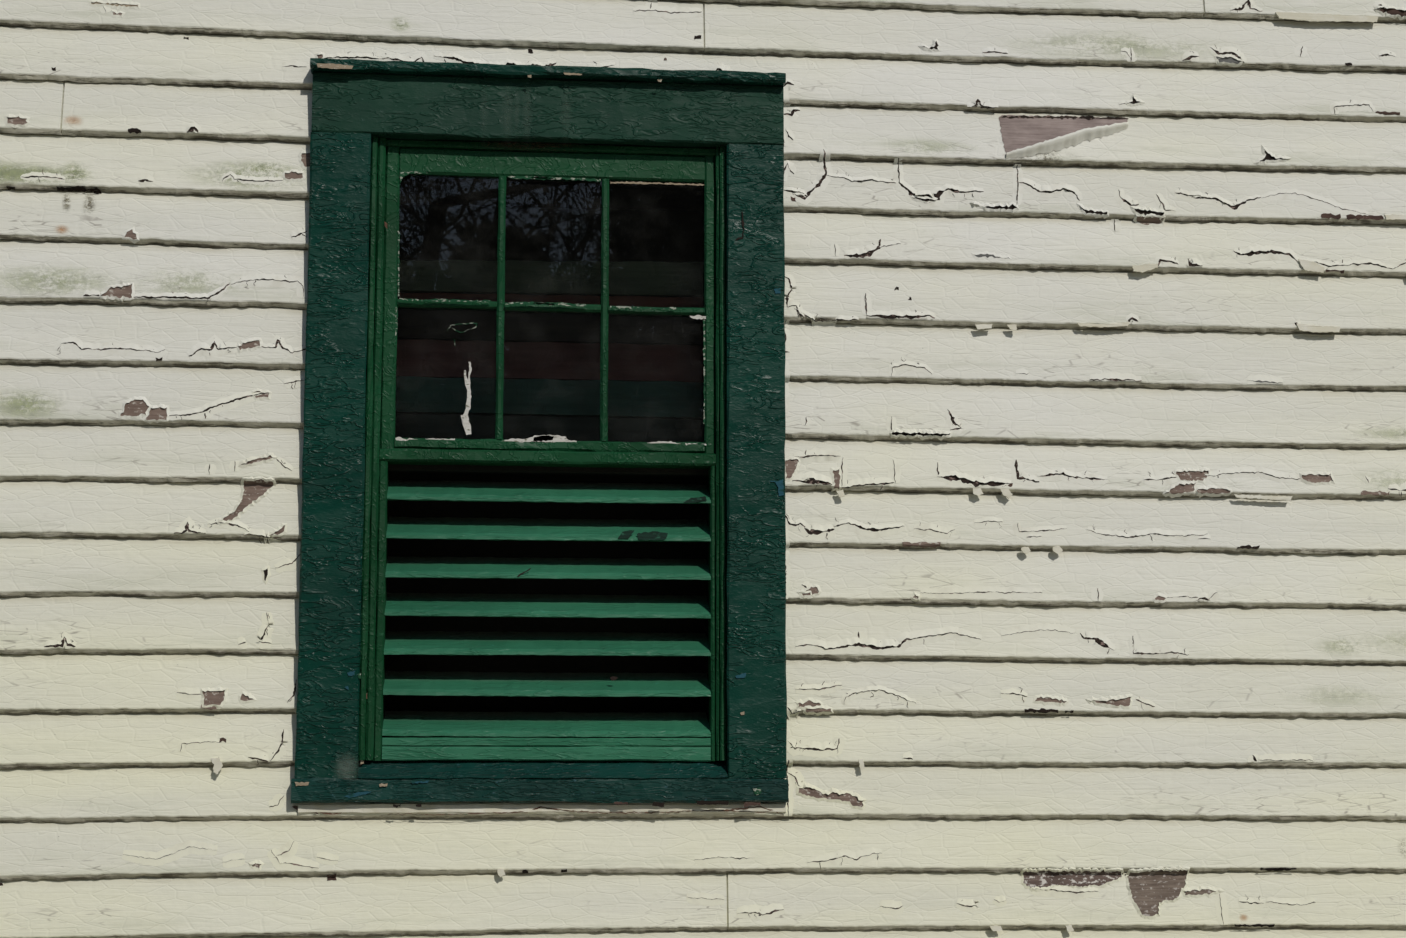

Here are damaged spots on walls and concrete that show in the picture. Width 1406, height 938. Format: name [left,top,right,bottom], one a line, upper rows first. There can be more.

peeling [118,376,305,424]
peeling [207,452,293,545]
peeling [930,462,1013,499]
peeling [1162,466,1335,500]
crack [786,457,1208,599]
crack [388,588,1189,816]
peeling [796,783,867,810]
crack [807,847,883,870]
crack [737,903,785,921]
crack [879,900,904,916]
crack [956,895,1007,912]
peeling [1020,865,1225,919]